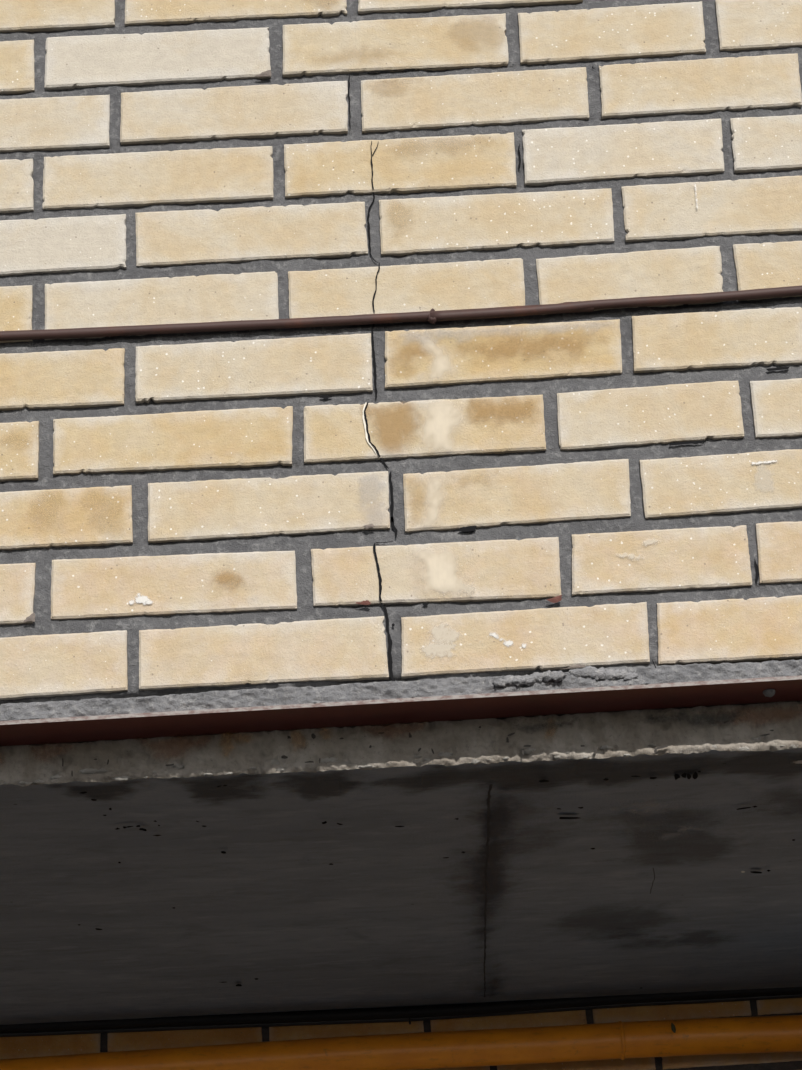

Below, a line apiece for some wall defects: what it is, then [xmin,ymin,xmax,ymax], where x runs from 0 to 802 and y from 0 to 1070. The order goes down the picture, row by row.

crack [348,67,449,681]
leakage [54,783,130,800]
leakage [186,775,258,801]
leakage [291,775,357,798]
leakage [387,753,802,788]
crack [476,784,509,997]